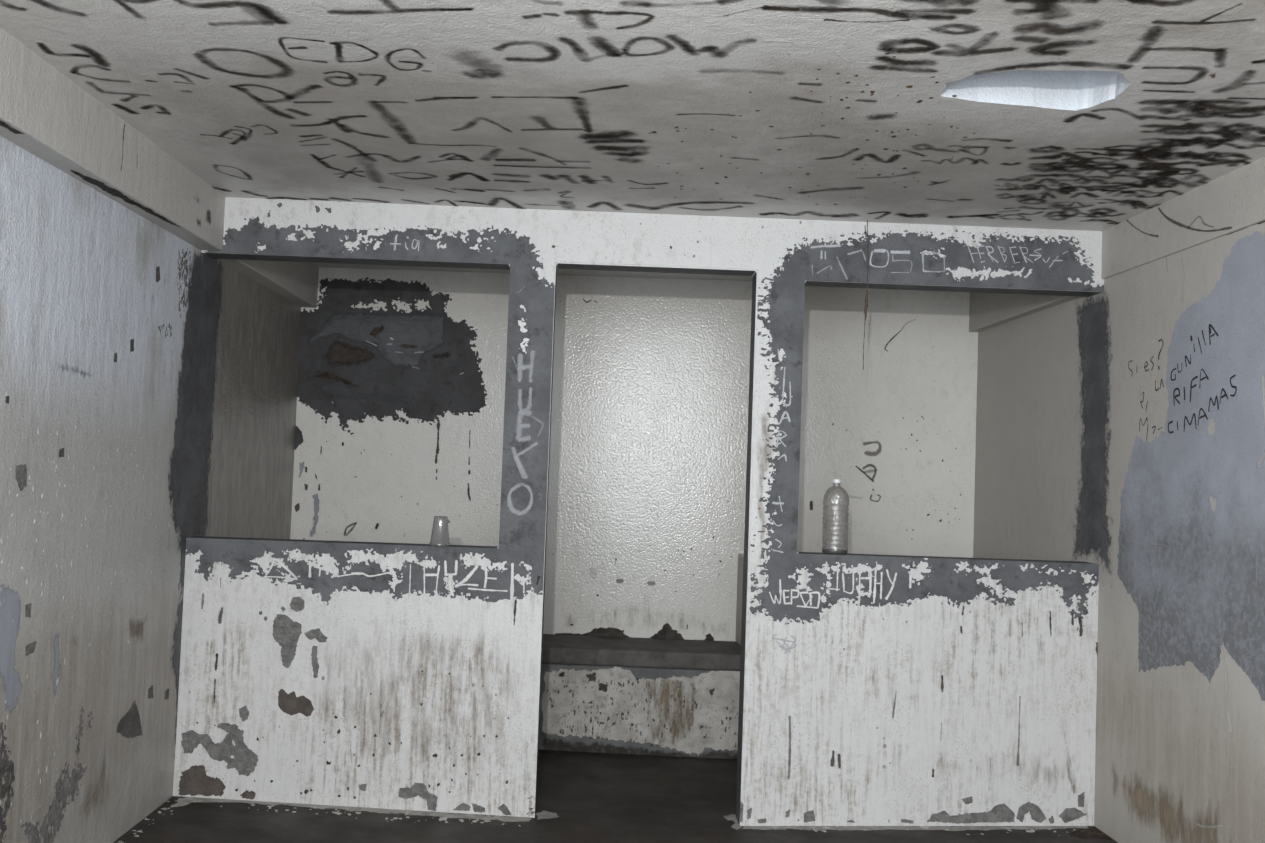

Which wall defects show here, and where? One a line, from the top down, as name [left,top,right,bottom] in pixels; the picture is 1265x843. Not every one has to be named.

peeling [158,248,191,338]
peeling [186,203,555,678]
peeling [749,230,1104,631]
peeling [1117,231,1265,701]
peeling [0,584,93,843]
spalling [116,685,169,738]
spalling [278,689,314,717]
spalling [398,783,438,811]
spalling [453,795,535,816]
spalling [739,802,767,823]
spalling [785,810,816,822]
leakage [1129,782,1217,843]